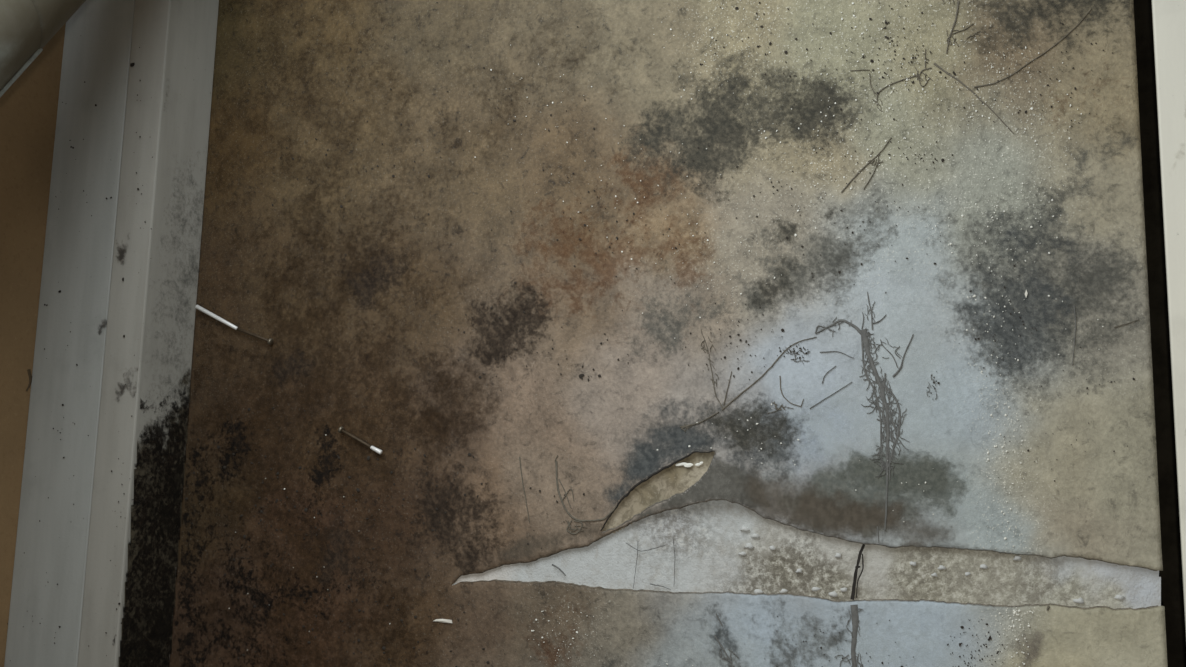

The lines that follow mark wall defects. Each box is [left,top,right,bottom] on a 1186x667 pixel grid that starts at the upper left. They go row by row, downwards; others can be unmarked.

leakage [615,34,877,189]
leakage [825,1,934,97]
leakage [451,282,568,378]
leakage [703,171,919,381]
leakage [959,217,1136,380]
leakage [113,339,496,667]
leakage [609,406,964,538]
peeling [453,499,1161,610]
crack [850,544,865,600]
leakage [947,619,1005,667]